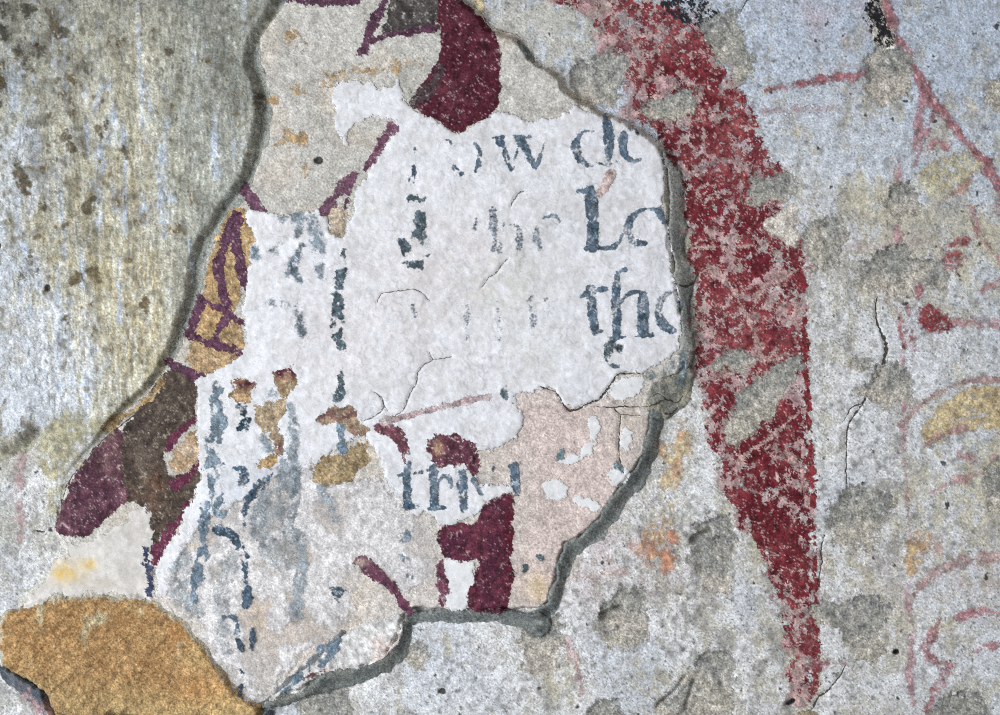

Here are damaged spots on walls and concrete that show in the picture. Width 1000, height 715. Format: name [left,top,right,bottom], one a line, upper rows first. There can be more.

mould [0,1,41,73]
leakage [46,129,77,154]
leakage [12,157,32,196]
leakage [81,196,99,215]
leakage [67,266,100,287]
crack [843,297,888,485]
spalling [312,405,410,487]
spalling [426,433,481,476]
peeling [444,558,475,611]
spalling [592,583,649,653]
spalling [685,511,739,599]
spalling [652,647,736,715]